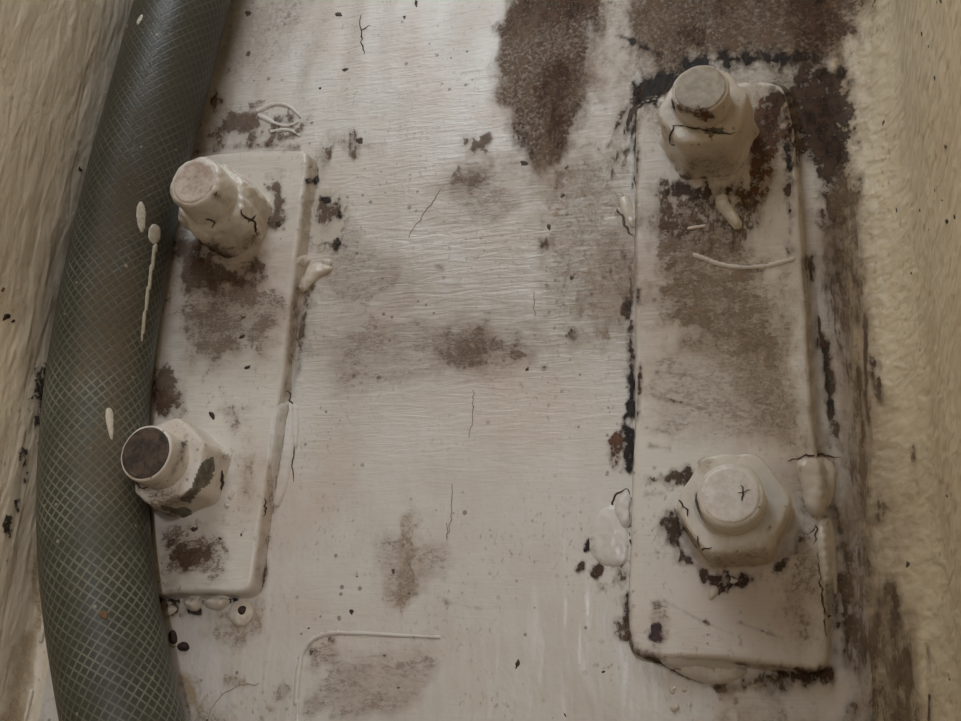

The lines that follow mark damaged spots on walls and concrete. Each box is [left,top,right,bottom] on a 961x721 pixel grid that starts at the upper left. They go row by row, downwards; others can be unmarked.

corrosion [608,0,887,523]
corrosion [576,539,604,588]
corrosion [614,593,692,680]
corrosion [834,505,931,721]
corrosion [714,666,834,704]